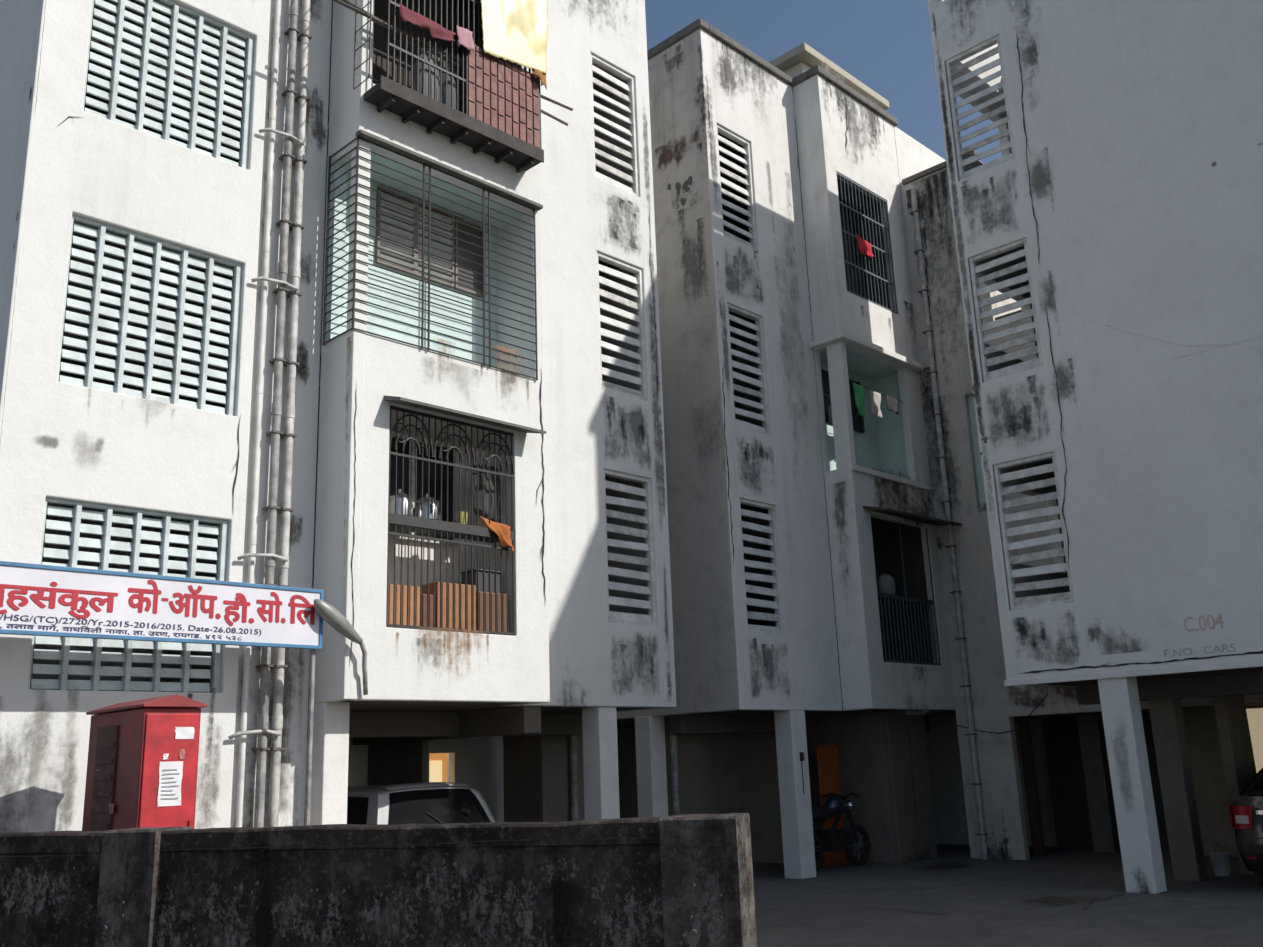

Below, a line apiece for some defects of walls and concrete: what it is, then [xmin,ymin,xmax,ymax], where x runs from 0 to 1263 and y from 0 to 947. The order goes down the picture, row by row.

damp [609,83,717,250]
damp [716,38,772,90]
damp [824,62,885,157]
crack [1016,34,1040,264]
damp [682,218,763,302]
damp [906,82,1043,442]
damp [40,436,58,447]
damp [606,304,665,506]
crack [1044,298,1069,560]
damp [614,572,671,693]
damp [1016,617,1140,663]
damp [59,744,75,824]